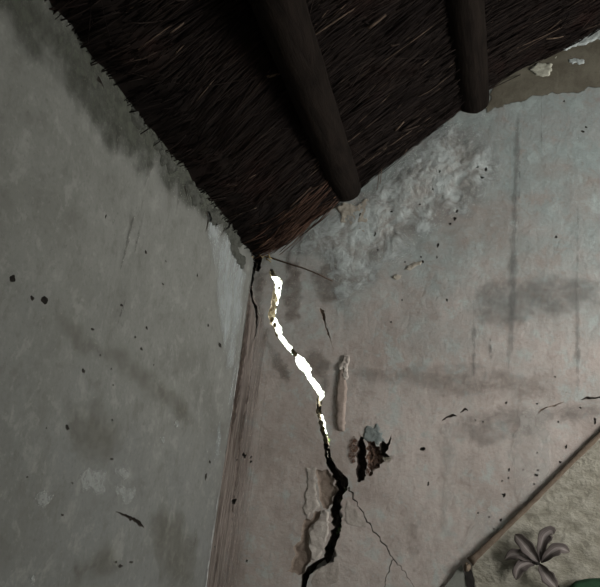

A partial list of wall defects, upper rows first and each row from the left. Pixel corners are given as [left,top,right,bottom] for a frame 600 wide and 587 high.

peeling [486,30,600,113]
crack [250,255,413,587]
flaking render [356,423,391,482]
crack [117,512,144,528]
flaking render [288,467,338,575]
flaking render [311,560,340,587]